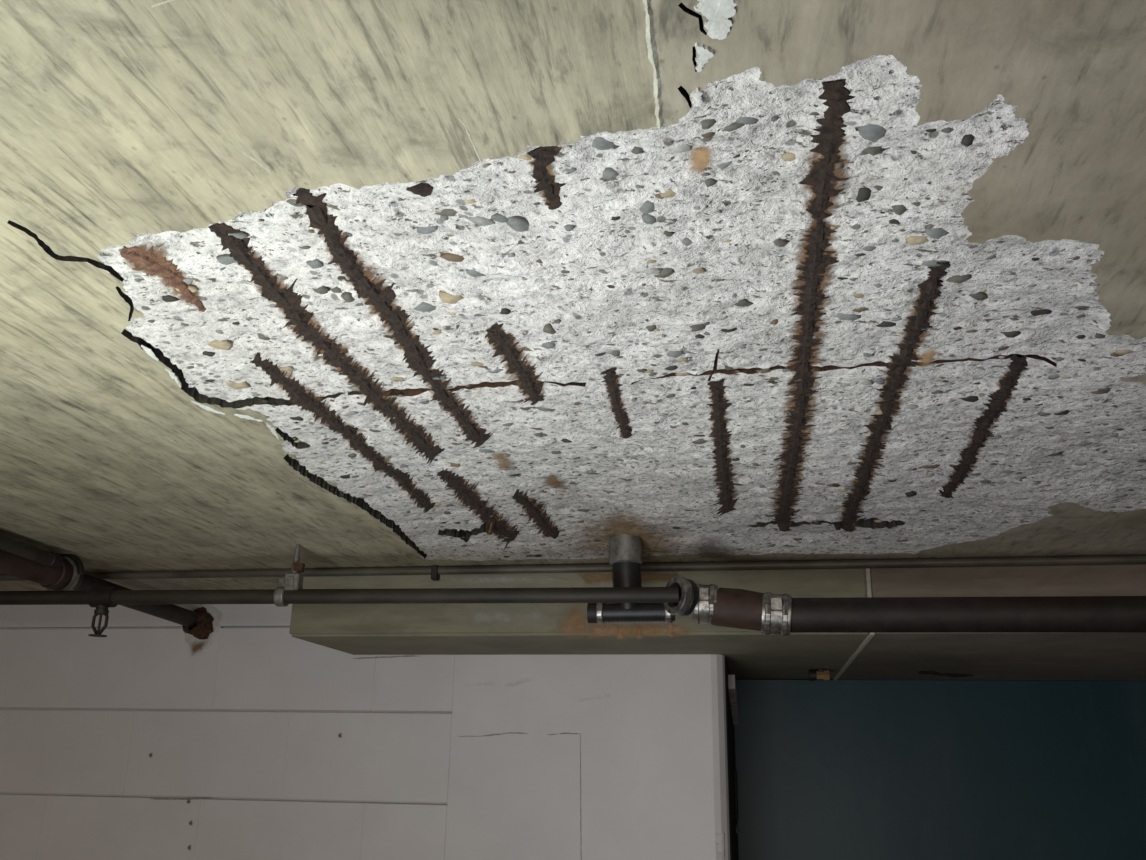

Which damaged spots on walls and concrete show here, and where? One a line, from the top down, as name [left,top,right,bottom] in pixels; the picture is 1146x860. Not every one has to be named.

corrosion [527,146,566,210]
corrosion [120,245,206,312]
crack [7,220,518,559]
corrosion [208,188,560,550]
crack [545,380,586,388]
spalling [98,0,1146,561]
corrosion [707,378,740,517]
crack [631,349,885,385]
corrosion [763,79,856,532]
corrosion [832,262,950,532]
corrosion [938,354,1029,498]
crack [914,354,1057,367]